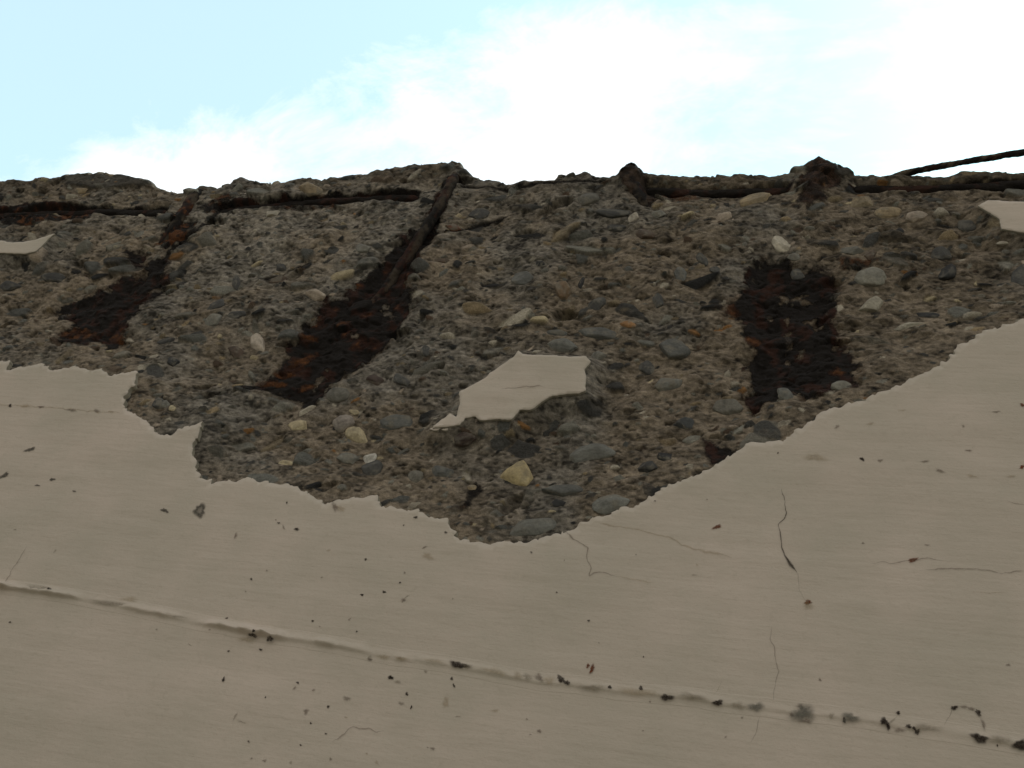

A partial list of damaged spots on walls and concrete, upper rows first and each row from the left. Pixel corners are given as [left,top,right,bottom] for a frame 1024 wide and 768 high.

corrosion [0,201,108,226]
corrosion [200,187,421,213]
corrosion [619,162,658,207]
corrosion [787,156,855,208]
corrosion [56,242,171,350]
corrosion [241,175,463,408]
spalling [0,161,1024,545]
corrosion [725,257,879,415]
crack [778,489,796,571]